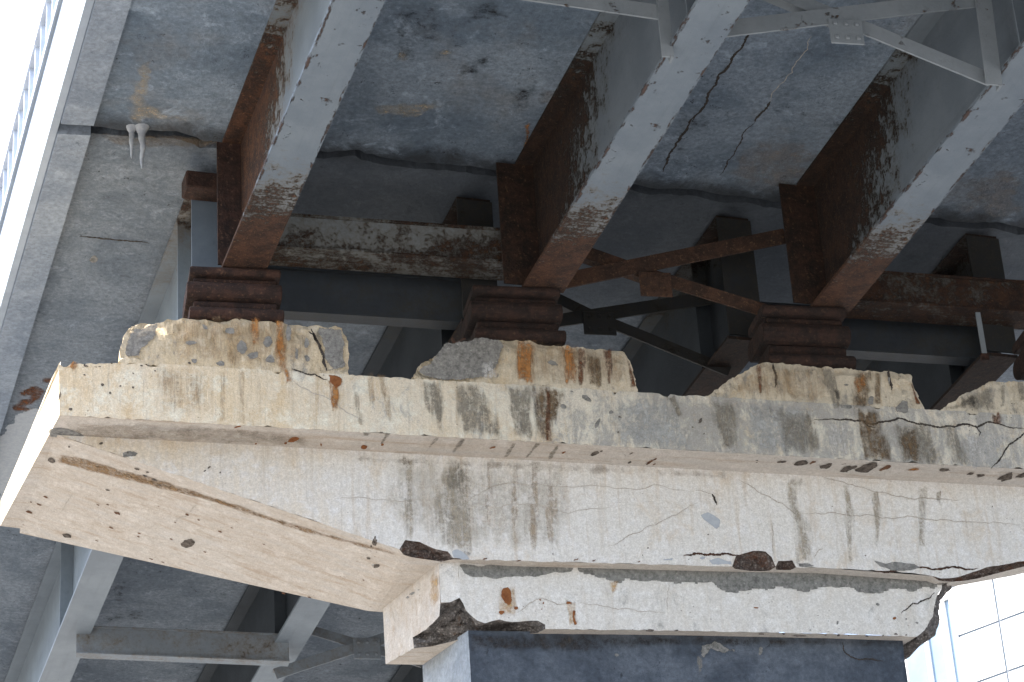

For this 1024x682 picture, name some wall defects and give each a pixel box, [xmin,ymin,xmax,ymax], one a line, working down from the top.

crack [663,35,749,171]
rust [13,379,51,412]
crack [292,329,360,419]
rust [329,375,342,407]
damp [424,382,442,422]
damp [457,386,498,444]
rust [517,342,533,382]
damp [510,388,563,459]
crack [814,417,1024,468]
damp [438,467,471,546]
rust [499,587,518,615]
peeling [399,540,1024,660]